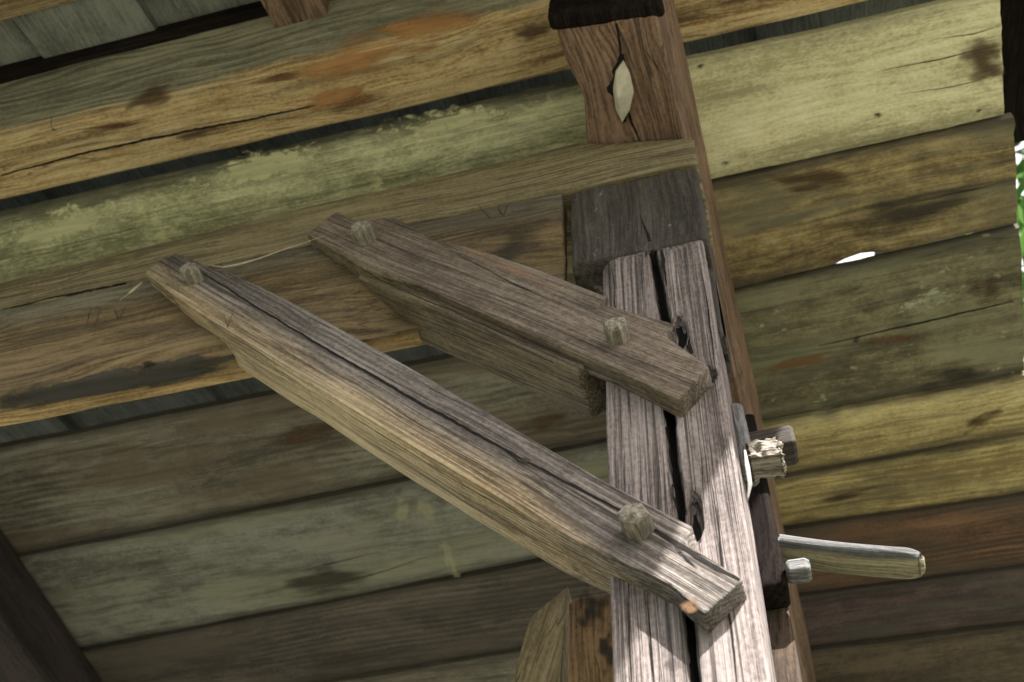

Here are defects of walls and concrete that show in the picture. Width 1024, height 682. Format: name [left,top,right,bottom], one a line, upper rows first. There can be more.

crack [614,23,622,60]
crack [882,23,1004,71]
leakage [127,87,168,108]
crack [0,104,317,176]
leakage [180,129,211,139]
leakage [497,232,533,260]
crack [640,215,671,324]
crack [819,301,1014,346]
leakage [0,355,235,409]
crack [204,273,621,511]
crack [653,410,740,580]
crack [686,615,700,682]